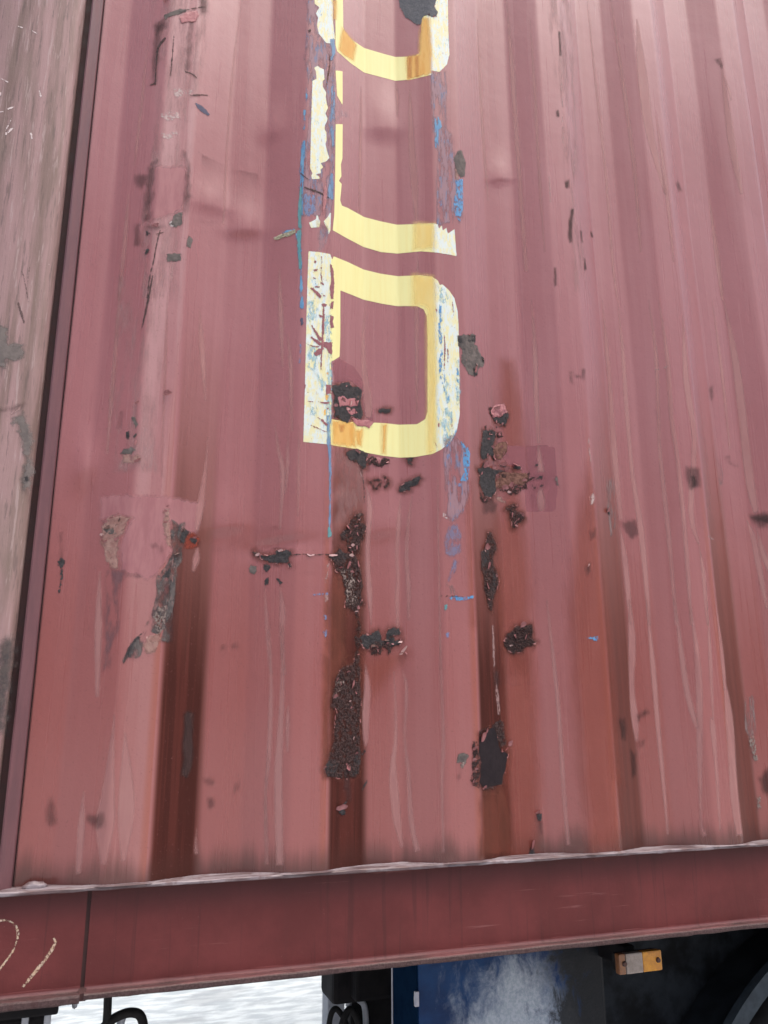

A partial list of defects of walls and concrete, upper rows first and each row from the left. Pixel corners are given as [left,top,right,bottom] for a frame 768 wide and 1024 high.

rust [399,0,438,79]
rust [457,334,485,377]
rust [332,382,421,492]
rust [480,404,509,461]
peeling [100,515,129,568]
rust [481,532,500,610]
rust [506,504,524,528]
rust [324,513,407,790]
rust [503,621,536,654]
rust [456,720,513,855]